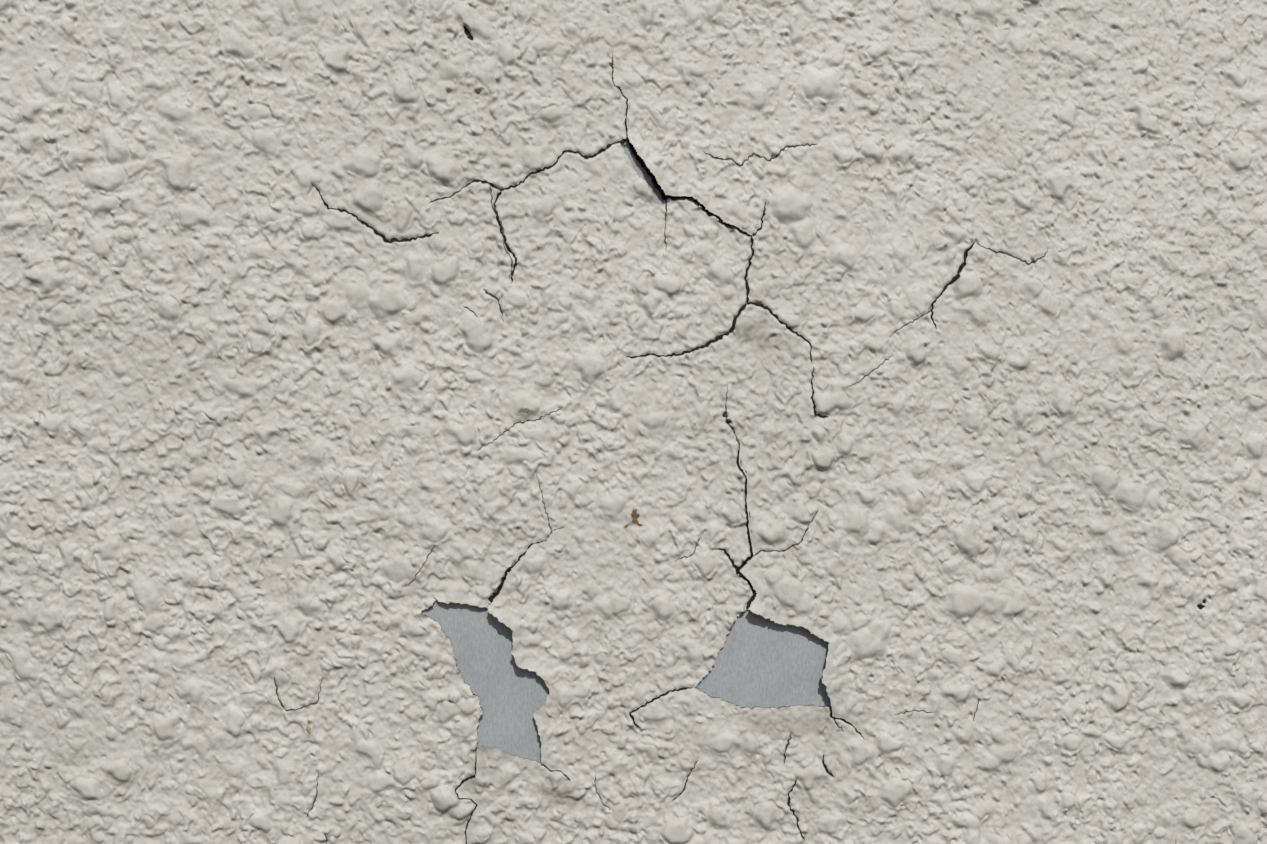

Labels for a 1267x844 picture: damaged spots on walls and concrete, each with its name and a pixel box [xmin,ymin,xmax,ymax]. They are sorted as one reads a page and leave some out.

crack [311,183,439,243]
crack [429,54,828,418]
crack [847,242,1048,387]
crack [478,409,560,450]
crack [487,474,564,607]
crack [674,385,819,608]
peeling [695,441,917,739]
crack [455,747,478,844]
peeling [421,524,644,844]
crack [629,687,693,727]
crack [784,734,835,840]
crack [830,707,864,738]